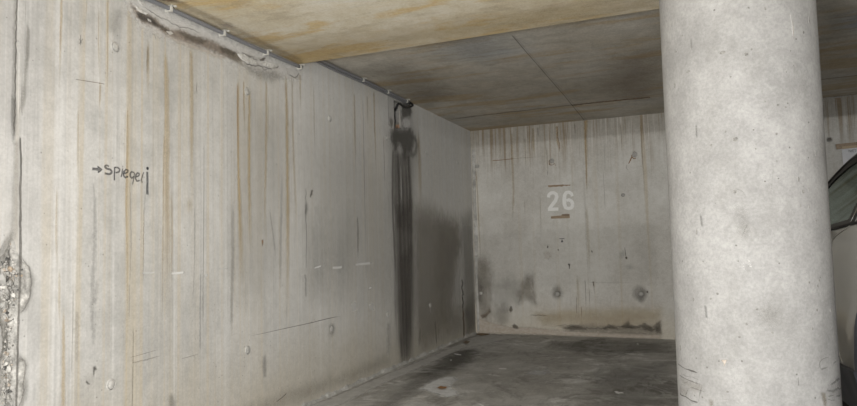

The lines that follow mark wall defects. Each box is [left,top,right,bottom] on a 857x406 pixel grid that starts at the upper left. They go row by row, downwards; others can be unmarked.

spalling [0,238,31,406]
leakage [312,104,469,406]
leakage [478,266,660,338]